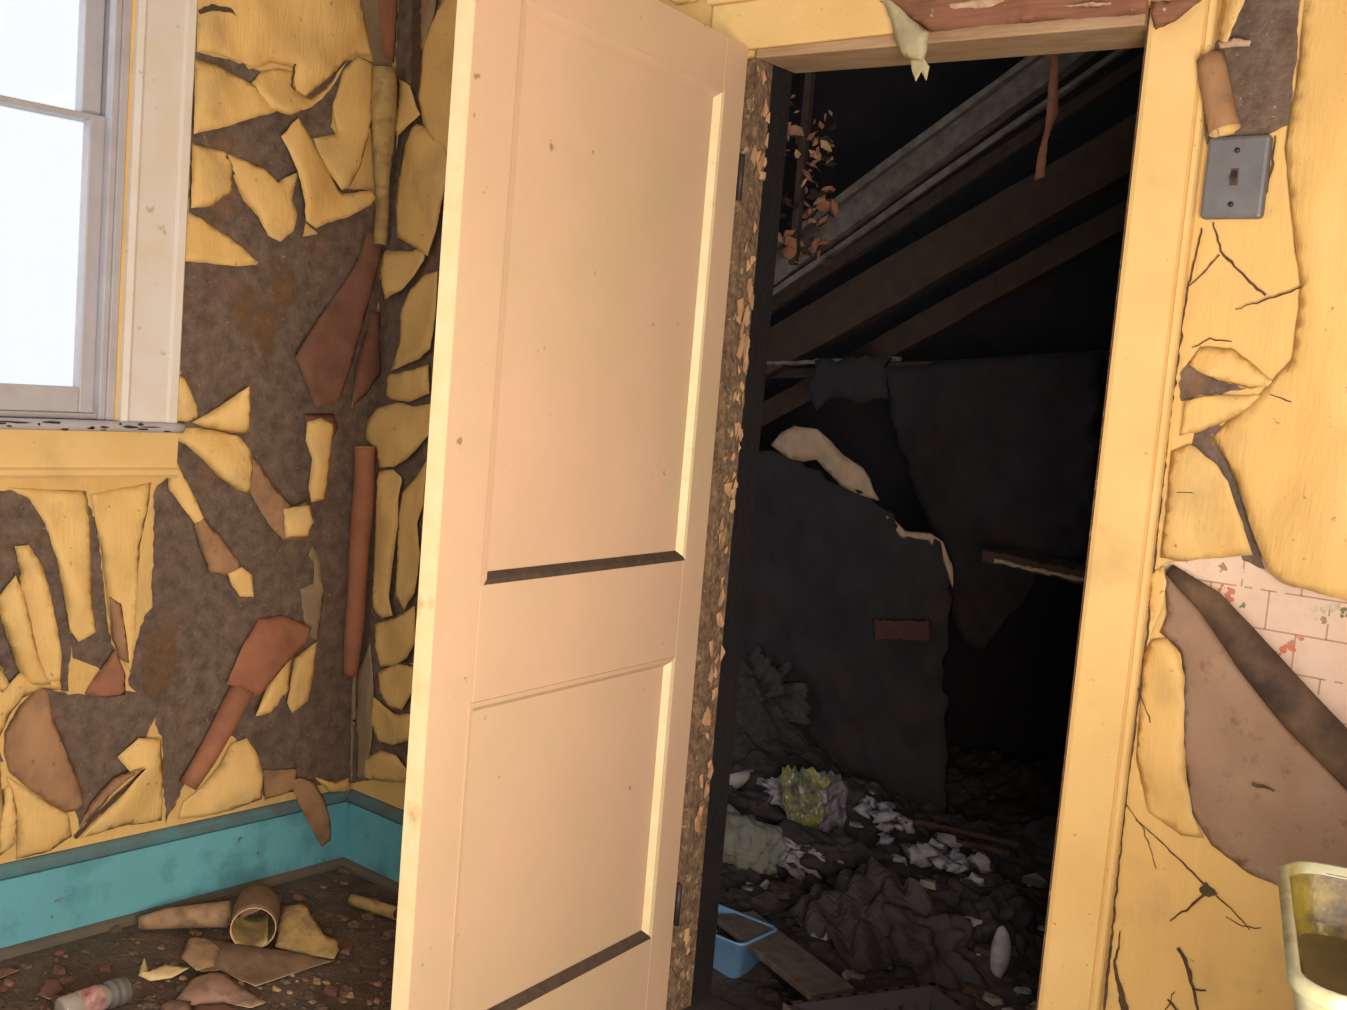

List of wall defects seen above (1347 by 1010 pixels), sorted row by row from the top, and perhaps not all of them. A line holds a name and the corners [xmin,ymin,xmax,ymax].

peeling [881,0,930,81]
peeling [749,70,770,196]
crack [1267,136,1276,192]
peeling [0,0,457,855]
peeling [719,221,757,553]
spalling [771,426,880,500]
peeling [1136,0,1347,886]
peeling [702,576,725,740]
crack [1103,228,1261,1010]
peeling [694,760,714,833]
peeling [683,928,691,981]